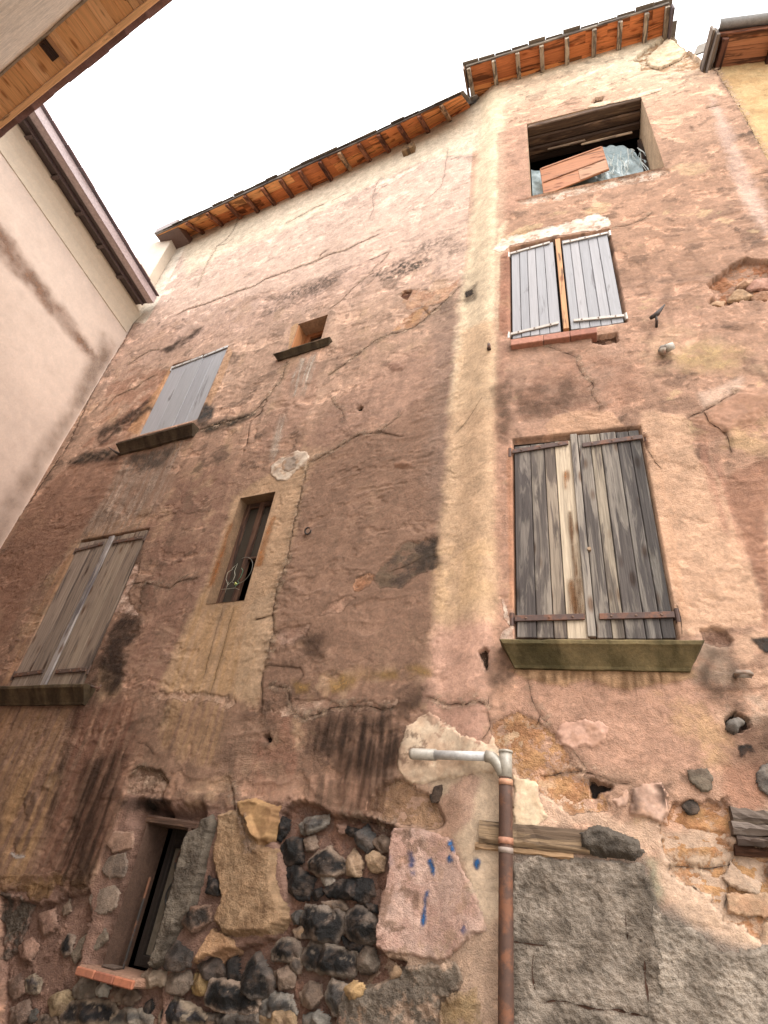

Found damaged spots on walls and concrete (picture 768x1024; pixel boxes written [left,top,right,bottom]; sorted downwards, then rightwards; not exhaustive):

peeling [636,37,705,73]
water stain [0,229,62,313]
crack [185,183,386,311]
crack [337,284,461,370]
flaking render [709,260,768,308]
crack [204,361,289,445]
crack [690,388,739,452]
water stain [69,400,183,534]
water stain [102,617,139,695]
water stain [62,755,124,882]
flaking render [491,712,768,939]
flaking render [0,780,483,1024]